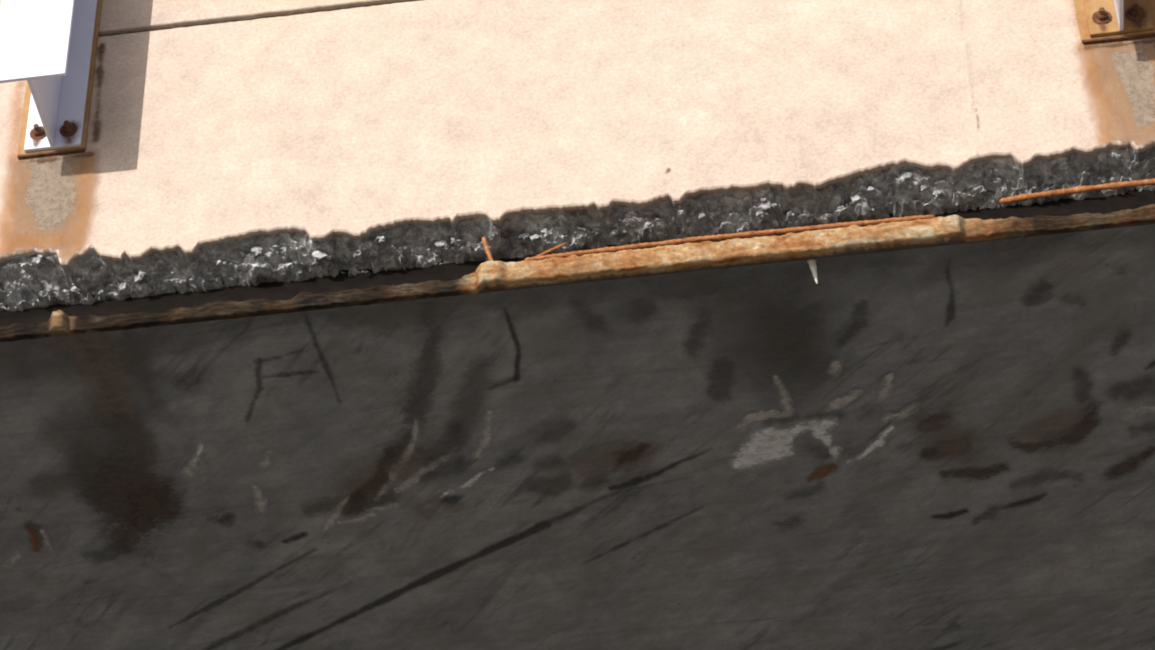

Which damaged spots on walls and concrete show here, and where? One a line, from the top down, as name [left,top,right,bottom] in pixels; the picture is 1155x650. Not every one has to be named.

corrosion [96,44,104,87]
corrosion [1084,16,1155,145]
corrosion [7,111,101,259]
spalling [0,146,1155,312]
crack [490,312,520,389]
leakage [733,373,918,468]